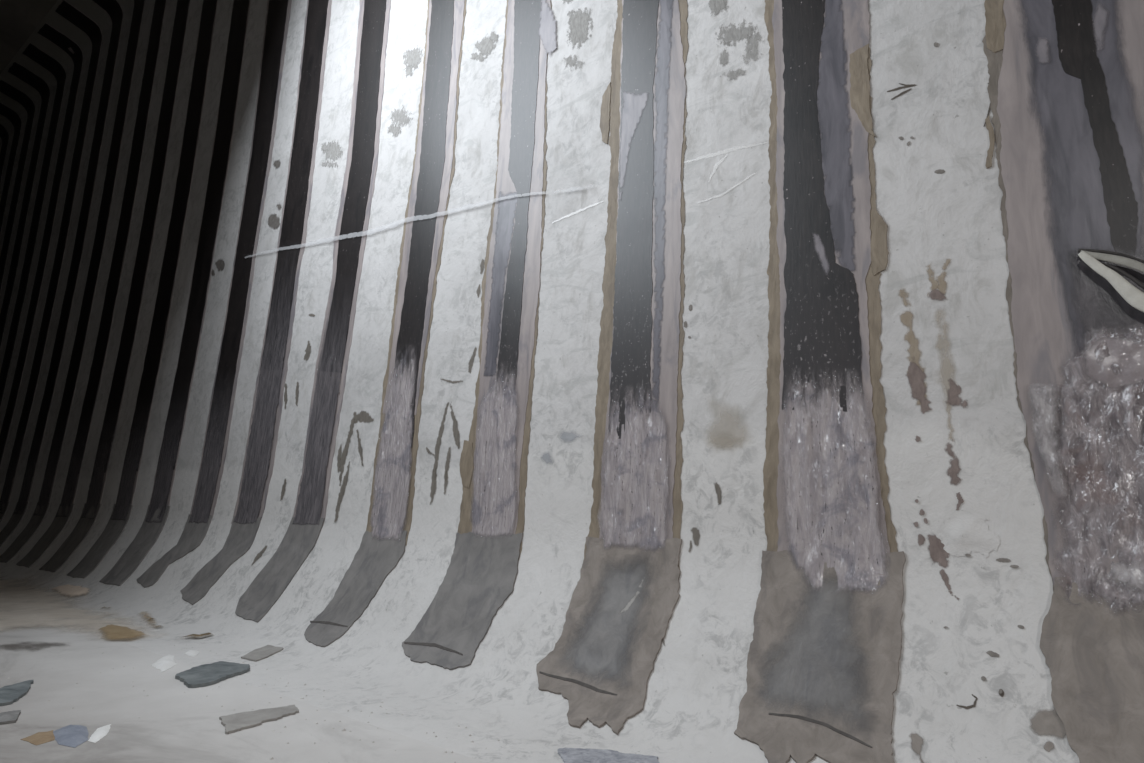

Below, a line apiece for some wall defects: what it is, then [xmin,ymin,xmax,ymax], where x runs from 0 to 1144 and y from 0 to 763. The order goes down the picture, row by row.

spalling [403,47,422,77]
spalling [471,32,499,62]
spalling [563,0,593,69]
spalling [388,107,413,137]
spalling [321,141,343,167]
corrosion [927,259,950,300]
corrosion [899,290,932,414]
corrosion [938,314,968,510]
leakage [689,528,700,552]
corrosion [914,499,959,599]